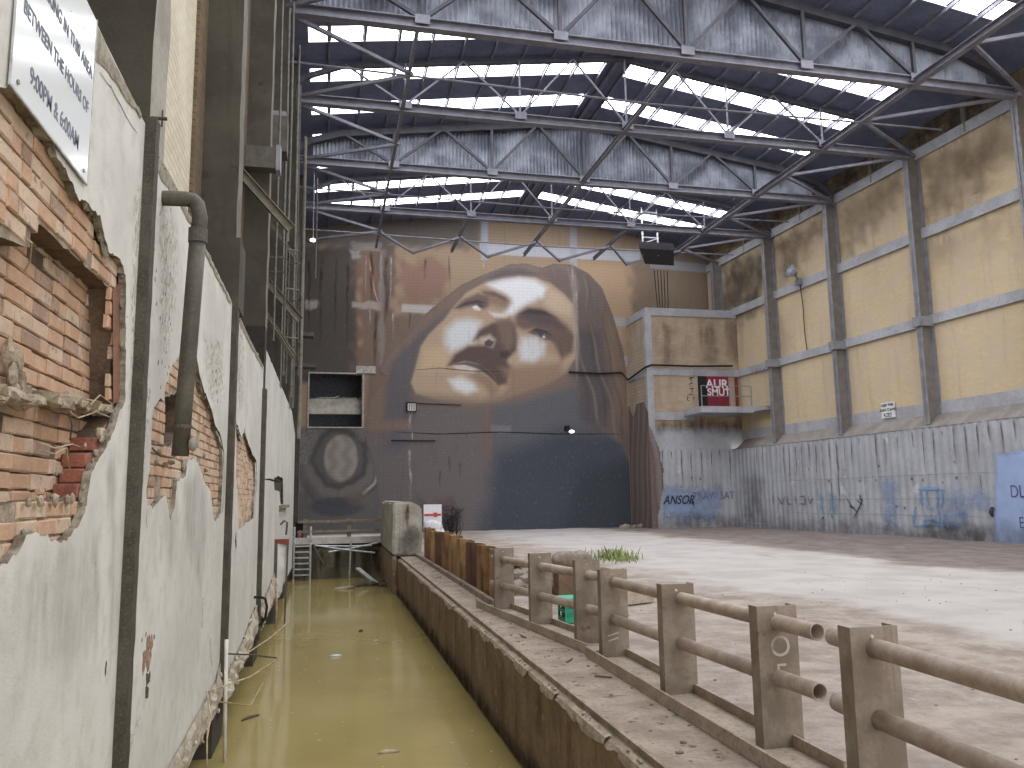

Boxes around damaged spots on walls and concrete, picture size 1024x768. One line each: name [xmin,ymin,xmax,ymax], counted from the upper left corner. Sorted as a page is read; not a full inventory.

spalling [0,92,137,558]
spalling [158,158,178,191]
spalling [146,206,221,518]
spalling [236,436,254,528]